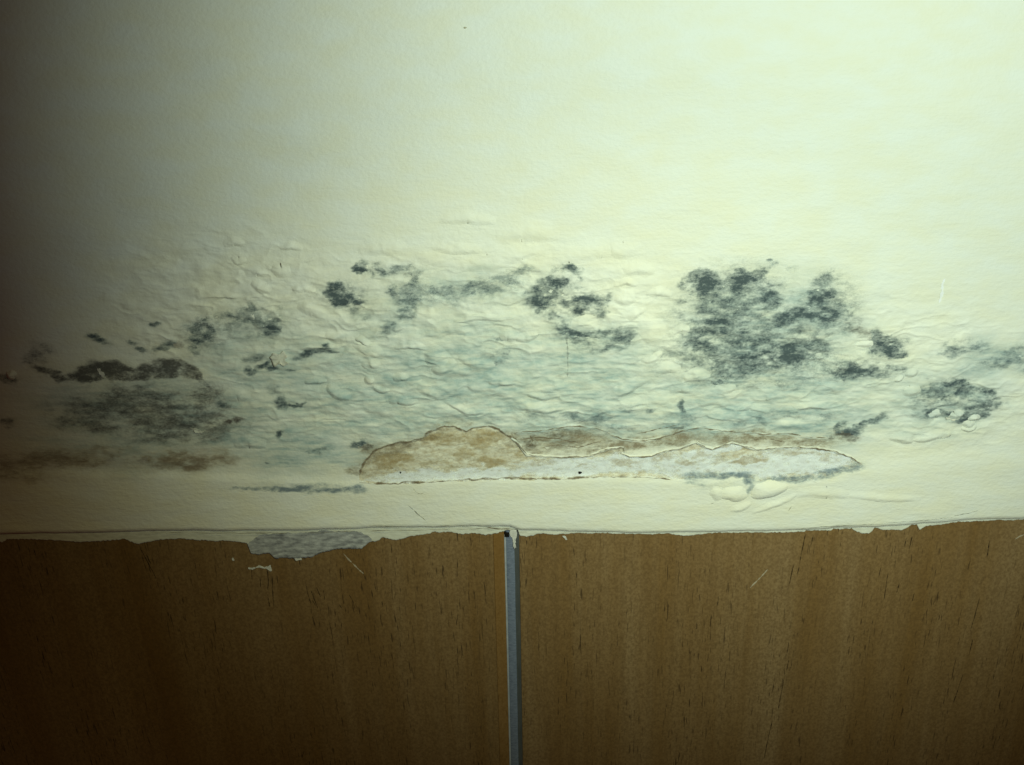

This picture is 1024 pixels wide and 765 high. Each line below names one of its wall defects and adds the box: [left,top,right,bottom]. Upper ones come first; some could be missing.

leakage [322,282,364,311]
leakage [351,264,419,334]
leakage [526,264,634,352]
leakage [679,259,848,385]
leakage [35,319,226,439]
leakage [244,344,336,375]
leakage [835,414,886,437]
leakage [831,330,907,381]
leakage [922,379,1001,424]
leakage [265,469,362,493]
flaking render [359,426,862,484]
leakage [689,472,751,484]